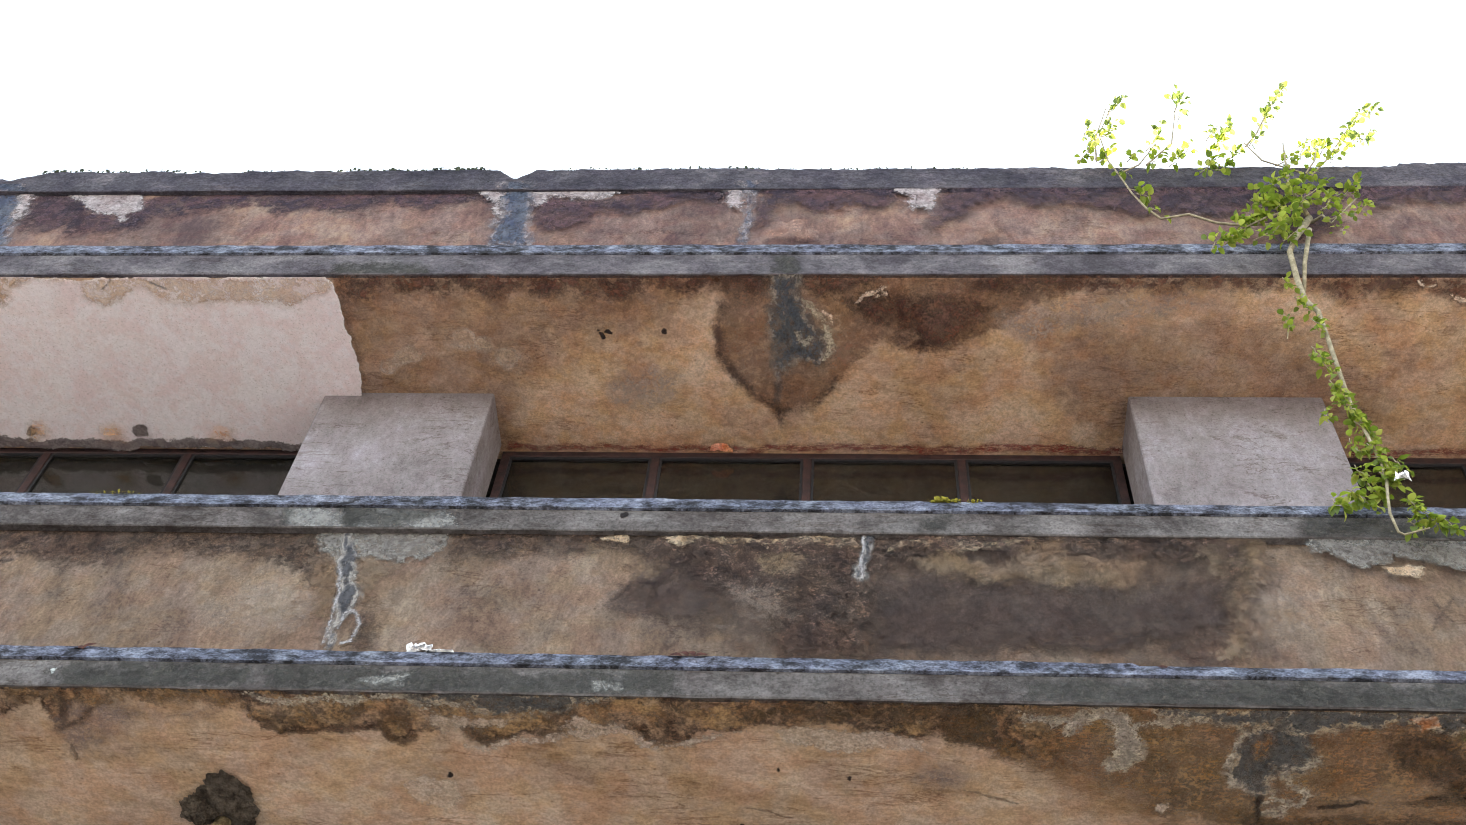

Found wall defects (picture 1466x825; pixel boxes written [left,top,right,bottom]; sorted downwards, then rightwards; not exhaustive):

water stain [0,425,302,452]
peeling [0,277,362,447]
water stain [56,254,1284,416]
peeling [1350,448,1466,458]
peeling [1308,539,1466,578]
water stain [0,507,1466,825]